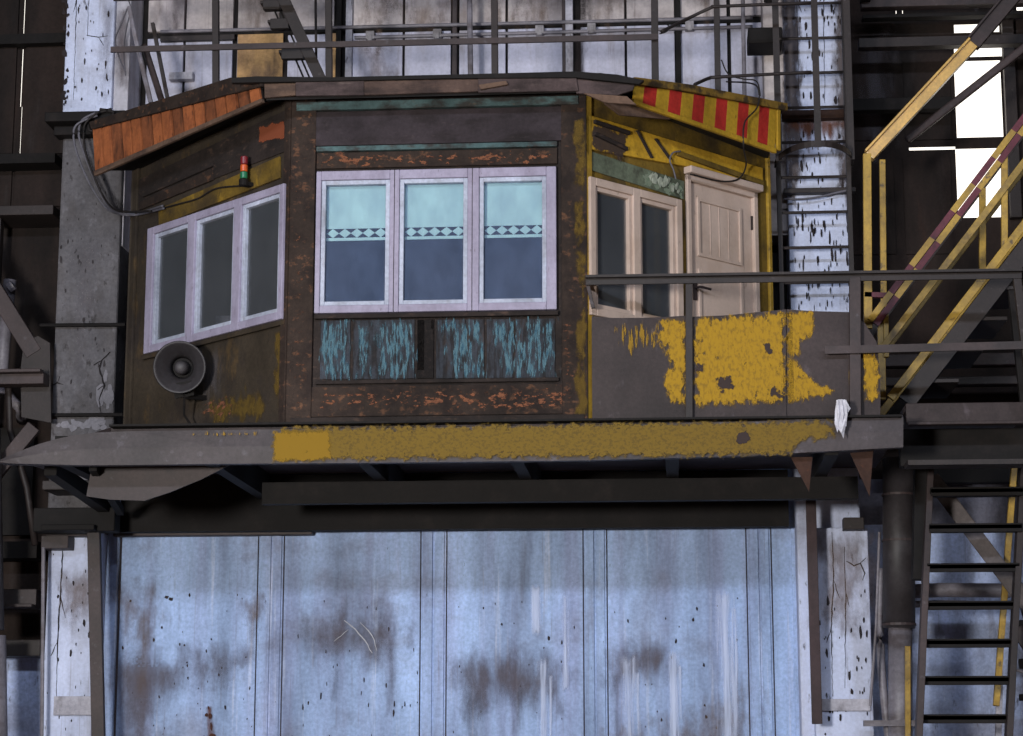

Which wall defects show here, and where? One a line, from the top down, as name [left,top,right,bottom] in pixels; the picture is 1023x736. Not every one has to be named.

peeling [780,0,844,110]
peeling [322,149,552,166]
peeling [575,202,586,297]
peeling [642,171,683,199]
peeling [783,121,848,271]
peeling [271,309,835,463]
peeling [618,283,849,408]
water stain [541,663,551,735]
water stain [670,654,687,736]
water stain [709,596,737,736]